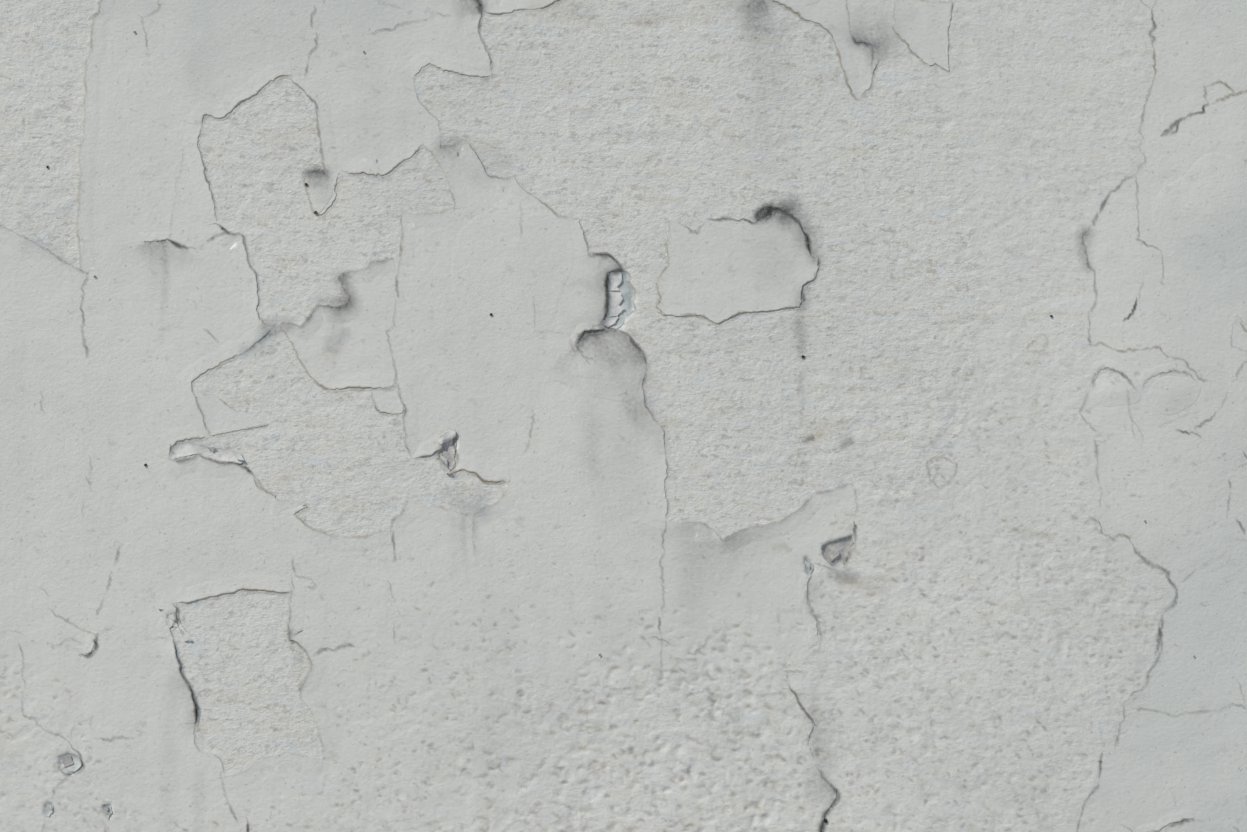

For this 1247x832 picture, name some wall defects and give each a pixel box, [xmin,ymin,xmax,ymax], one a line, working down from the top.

peeling [0,0,116,286]
crack [141,231,214,248]
peeling [154,0,969,555]
crack [1085,358,1177,387]
flaking render [804,536,853,576]
crack [77,630,98,657]
peeling [155,573,339,792]